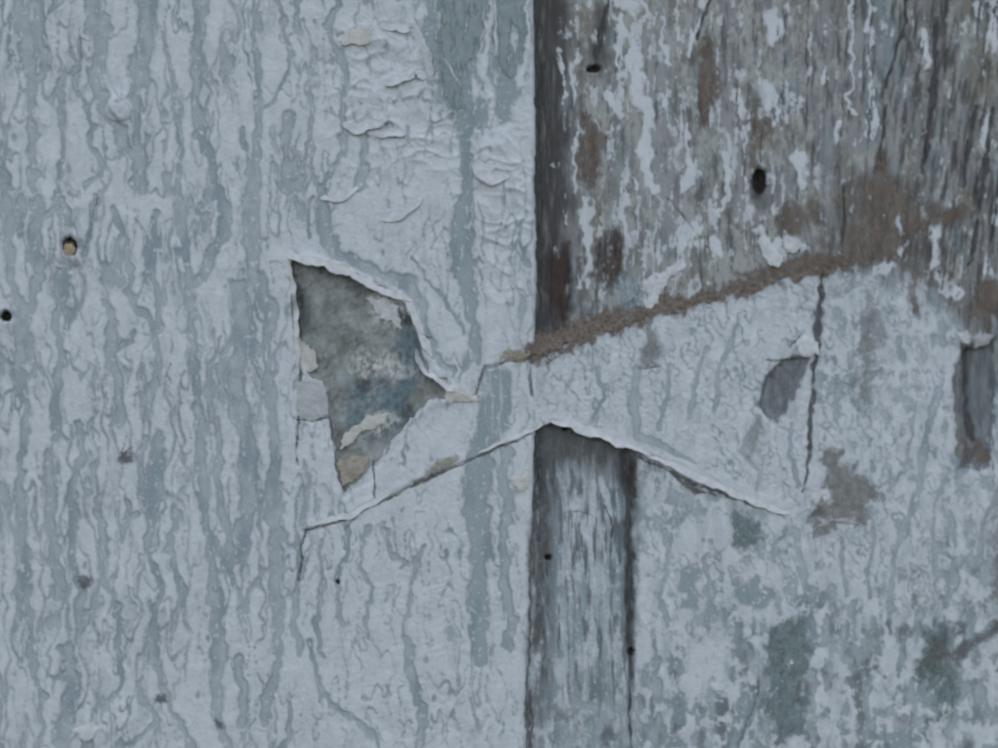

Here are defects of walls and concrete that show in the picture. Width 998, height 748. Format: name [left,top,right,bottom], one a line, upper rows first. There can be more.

peeling [381,0,528,118]
peeling [341,95,406,139]
spalling [286,254,480,492]
crack [476,361,533,395]
peeling [759,334,820,423]
crack [766,276,826,492]
peeling [957,330,994,348]
peeling [806,446,886,537]